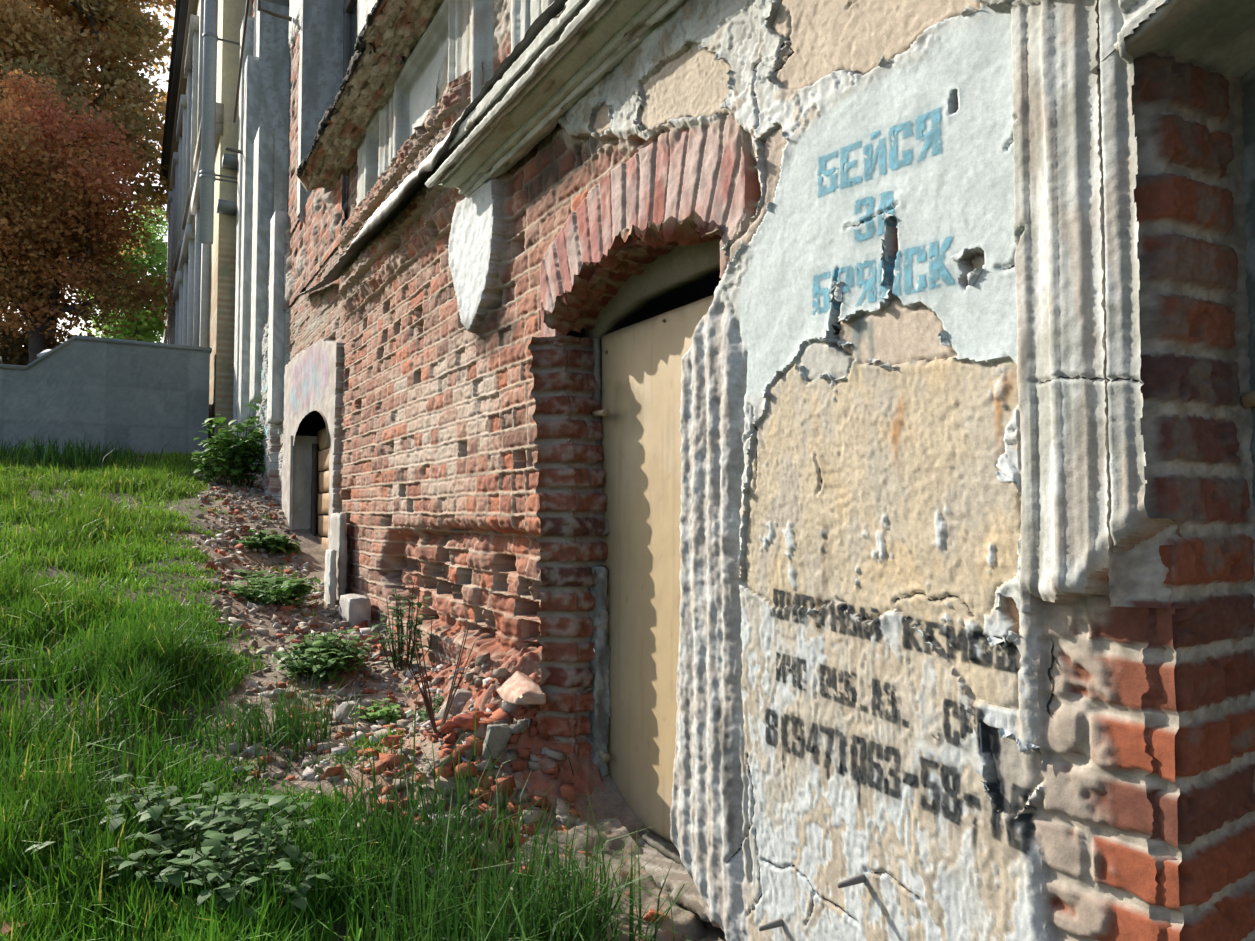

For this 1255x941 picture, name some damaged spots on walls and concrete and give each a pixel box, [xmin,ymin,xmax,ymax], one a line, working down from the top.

flaking render [338,40,733,666]
peeling [764,0,981,90]
flaking render [948,88,959,114]
peeling [739,213,1184,941]